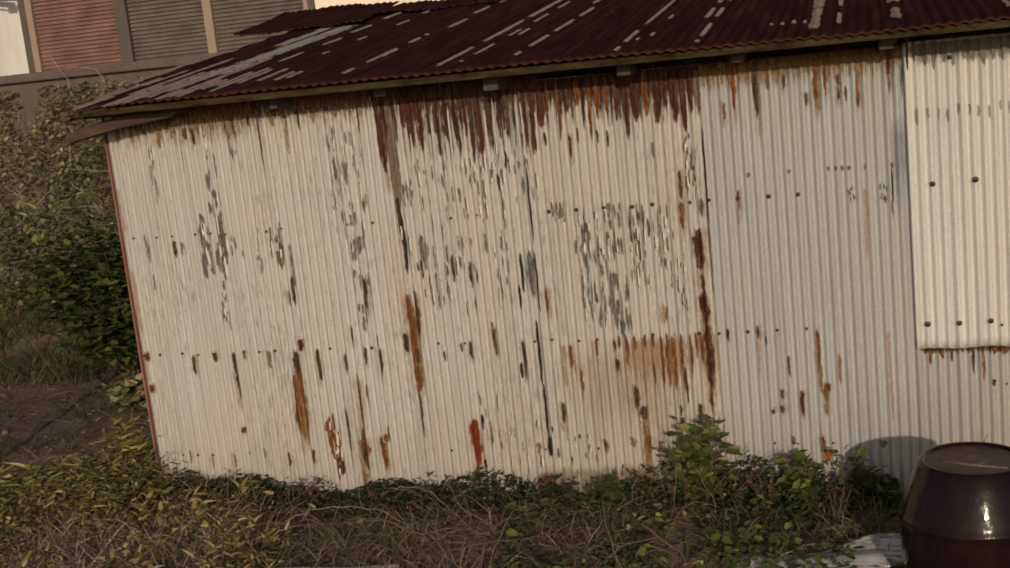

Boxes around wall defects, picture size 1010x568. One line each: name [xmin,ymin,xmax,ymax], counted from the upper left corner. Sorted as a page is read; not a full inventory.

peeling [326,126,370,332]
peeling [400,145,539,315]
corrosion [110,44,901,273]
peeling [551,199,688,337]
peeling [683,133,704,216]
corrosion [292,339,315,463]
corrosion [324,354,390,484]
corrosion [403,294,425,436]
corrosion [470,419,483,487]
corrosion [613,228,716,478]
corrosion [816,331,842,415]
corrosion [921,345,1010,386]